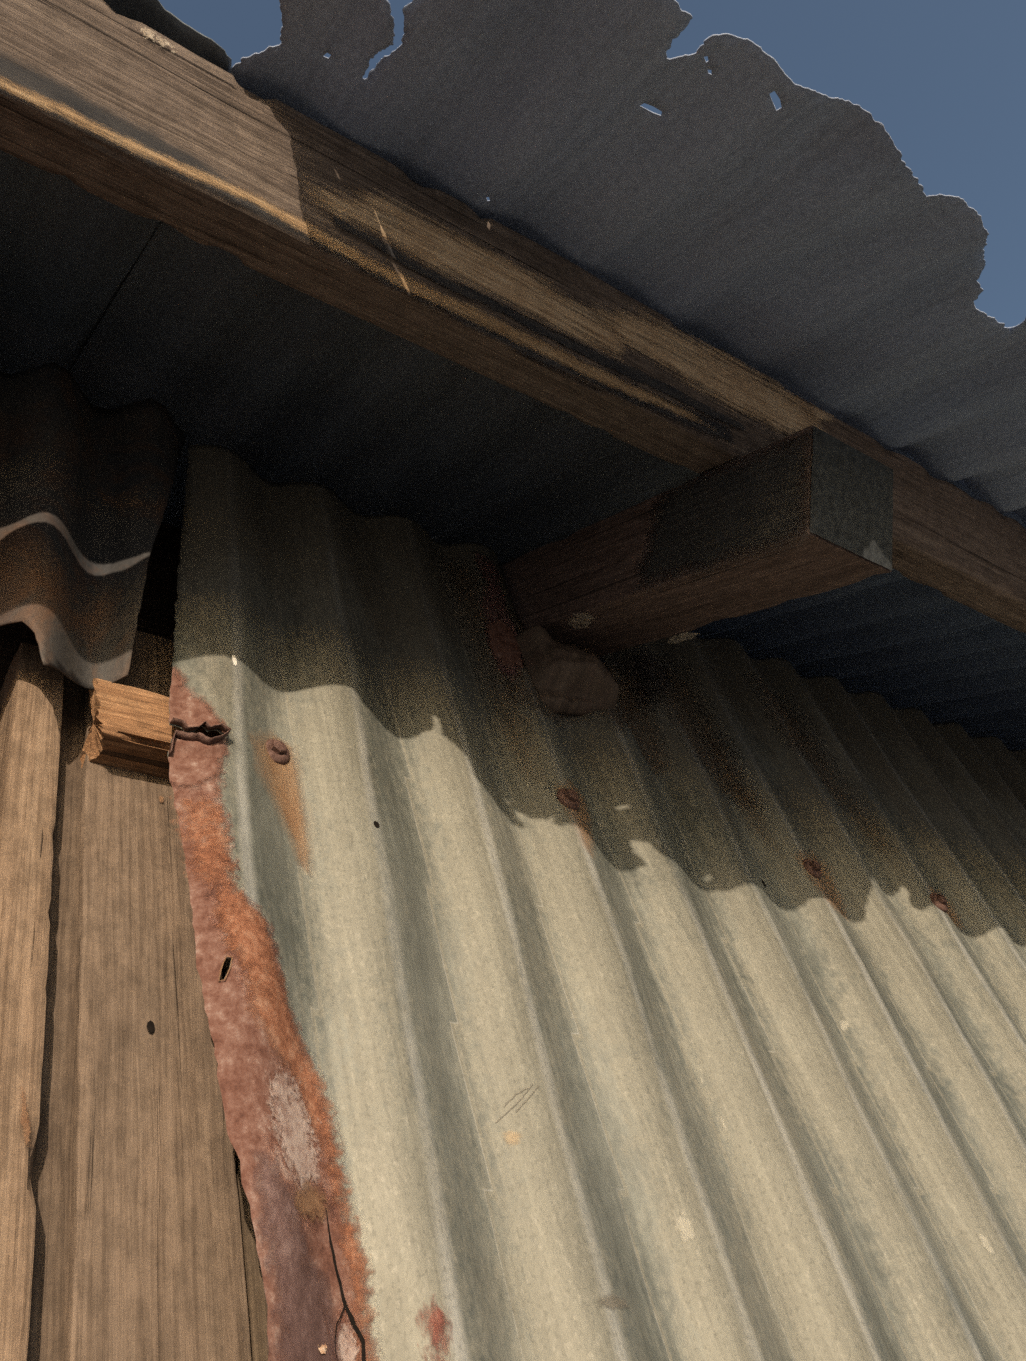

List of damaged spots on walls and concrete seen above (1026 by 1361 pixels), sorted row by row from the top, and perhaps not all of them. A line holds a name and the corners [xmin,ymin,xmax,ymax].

rust [168,736,373,1361]
crack [325,1208,366,1361]
rust [421,1305,447,1361]